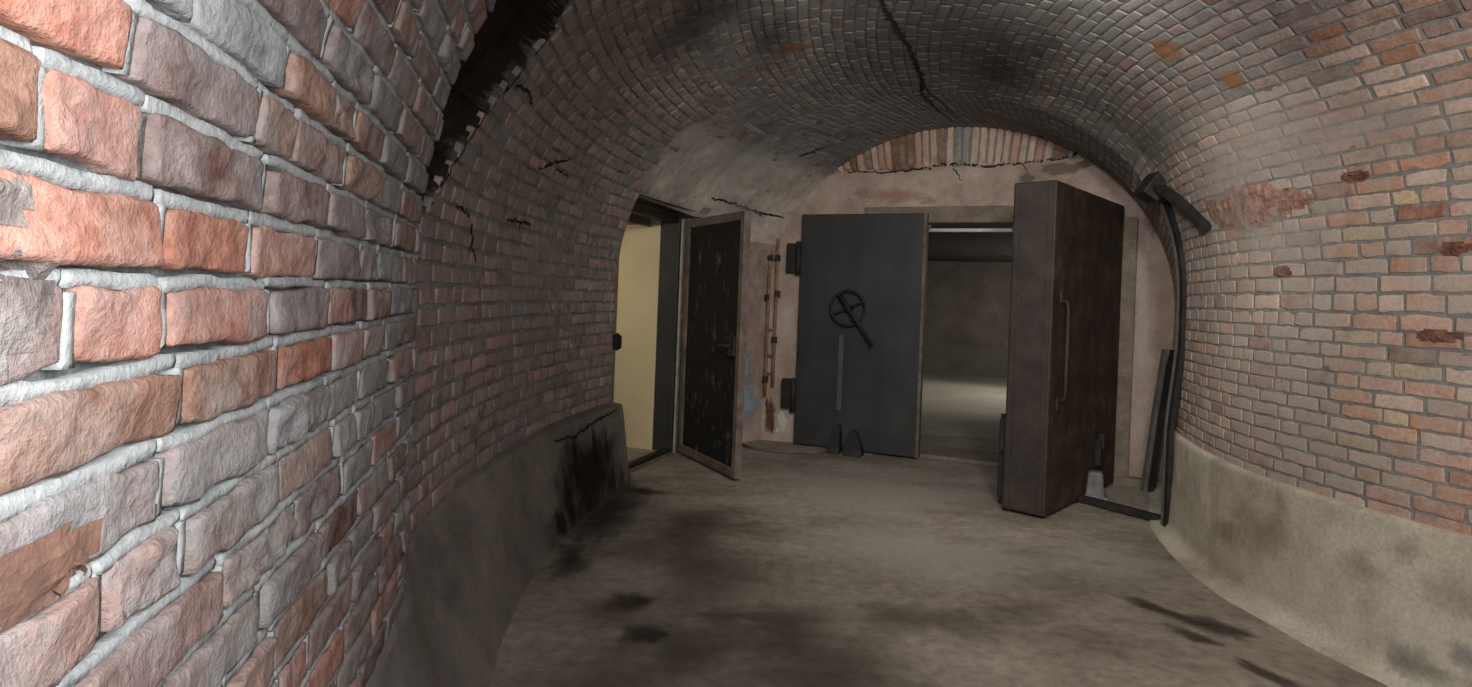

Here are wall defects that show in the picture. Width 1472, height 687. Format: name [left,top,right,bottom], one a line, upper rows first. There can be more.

crack [879,0,958,121]
crack [423,0,564,263]
crack [539,158,572,177]
crack [711,197,784,218]
spalling [1206,182,1318,234]
damp [556,433,654,570]